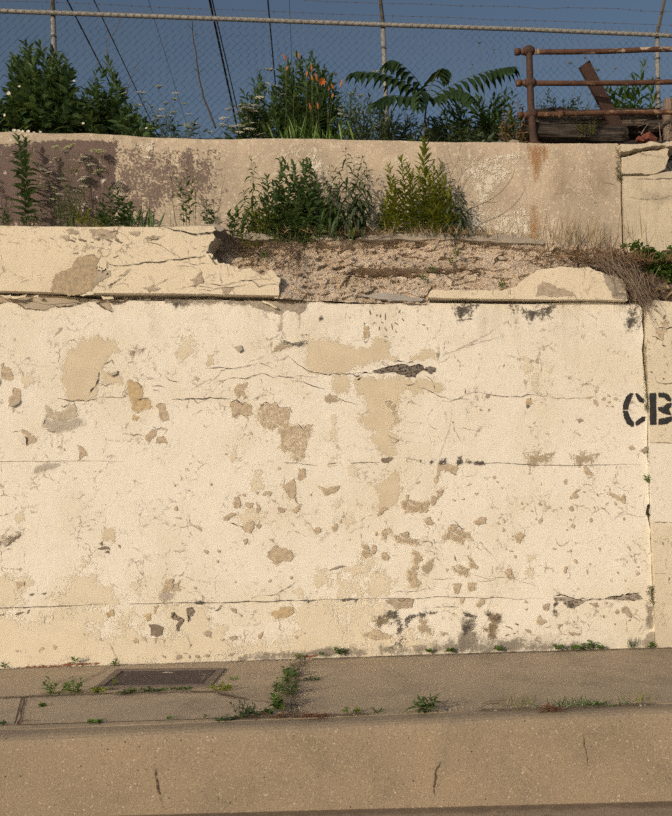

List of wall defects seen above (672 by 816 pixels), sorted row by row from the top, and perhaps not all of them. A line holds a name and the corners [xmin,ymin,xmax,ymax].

peeling [0,252,127,311]
peeling [1,363,40,407]
peeling [45,333,169,421]
spalling [205,231,657,545]
peeling [442,517,526,558]
crack [6,602,93,610]
peeling [0,526,451,669]
crack [135,583,338,611]
crack [359,556,536,607]
peeling [445,555,486,608]
leakage [374,609,596,655]
spalling [505,592,643,636]